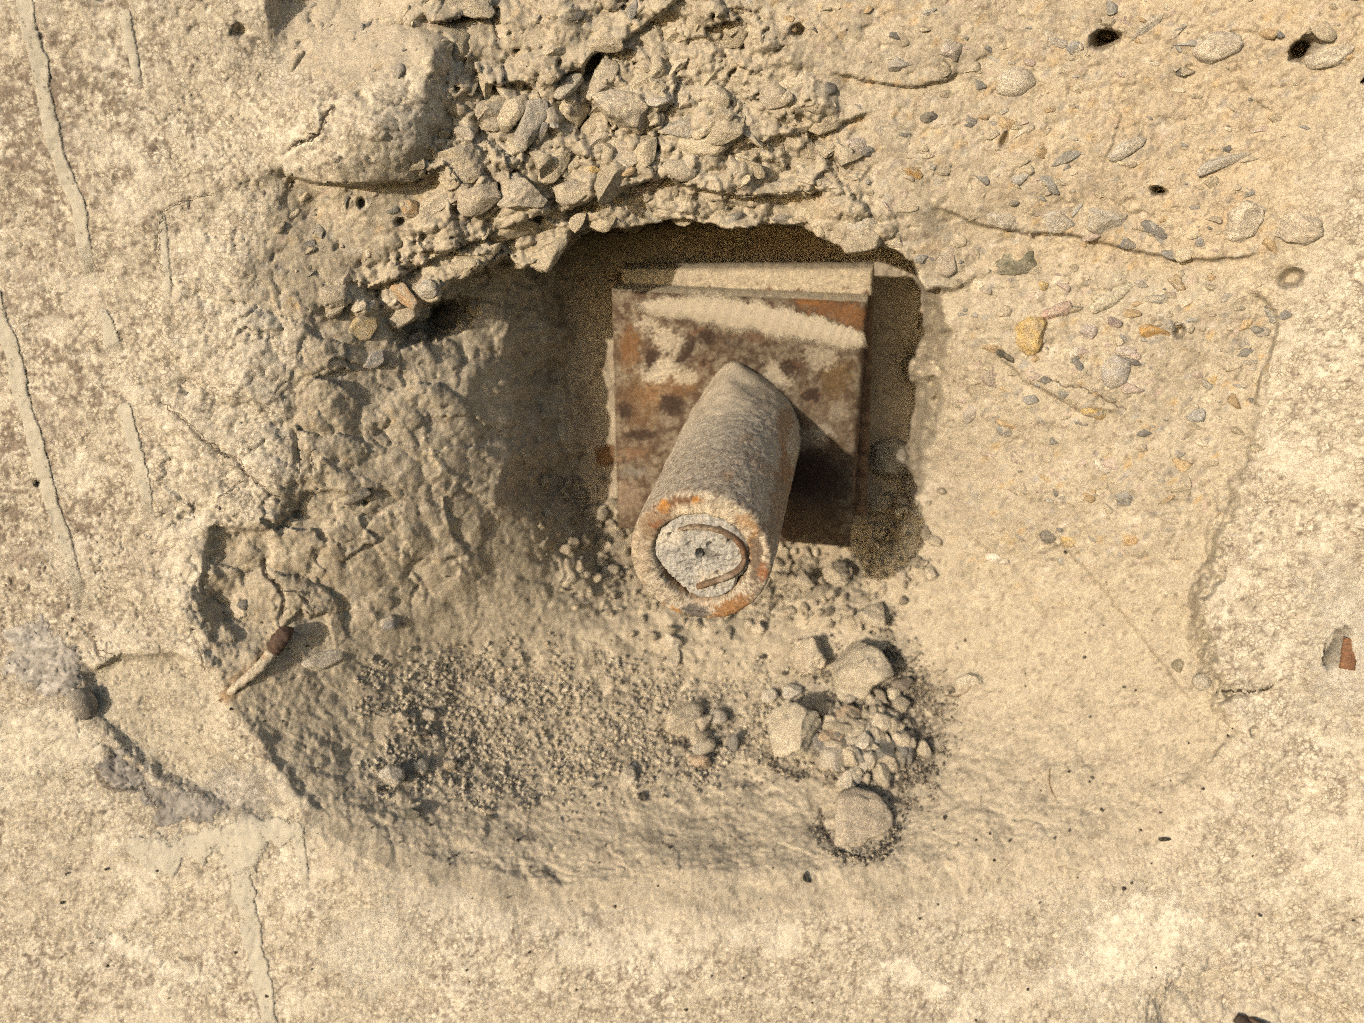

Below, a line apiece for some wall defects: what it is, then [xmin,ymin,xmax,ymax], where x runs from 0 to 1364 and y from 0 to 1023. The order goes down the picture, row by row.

spalling [250,0,1364,565]